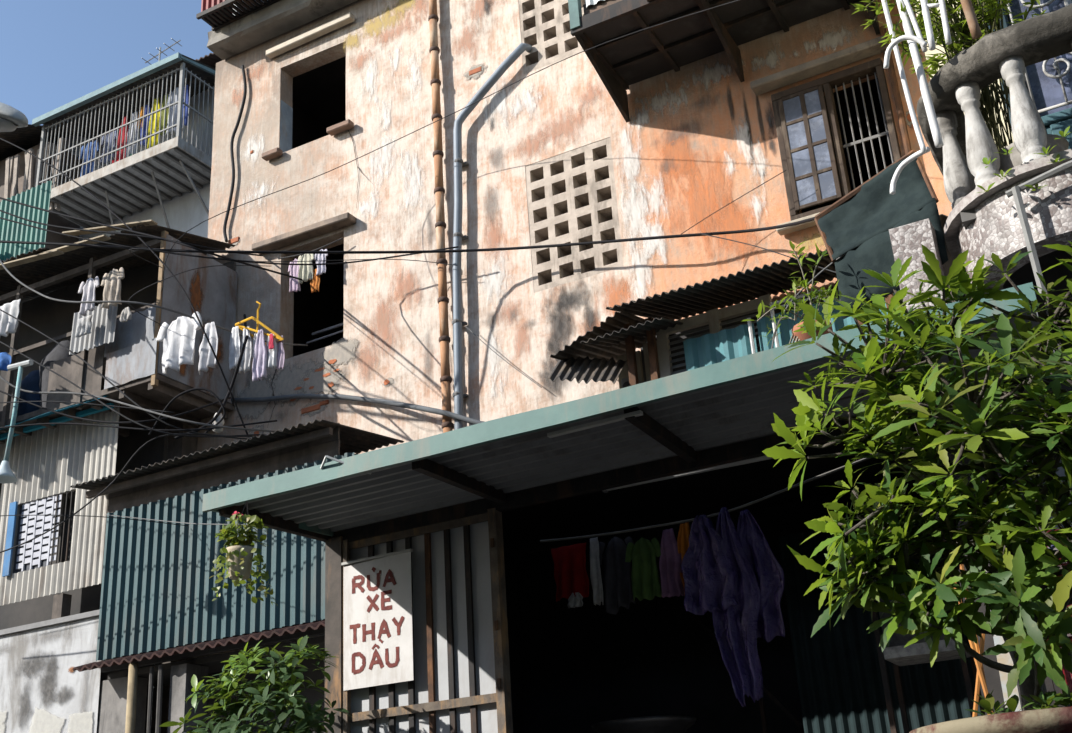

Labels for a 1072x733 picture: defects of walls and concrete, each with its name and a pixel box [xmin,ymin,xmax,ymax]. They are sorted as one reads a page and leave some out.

spalling [464,63,487,80]
damp [727,87,775,176]
peeling [371,302,396,348]
damp [541,282,595,393]
peeling [233,339,375,438]
damp [19,656,70,724]